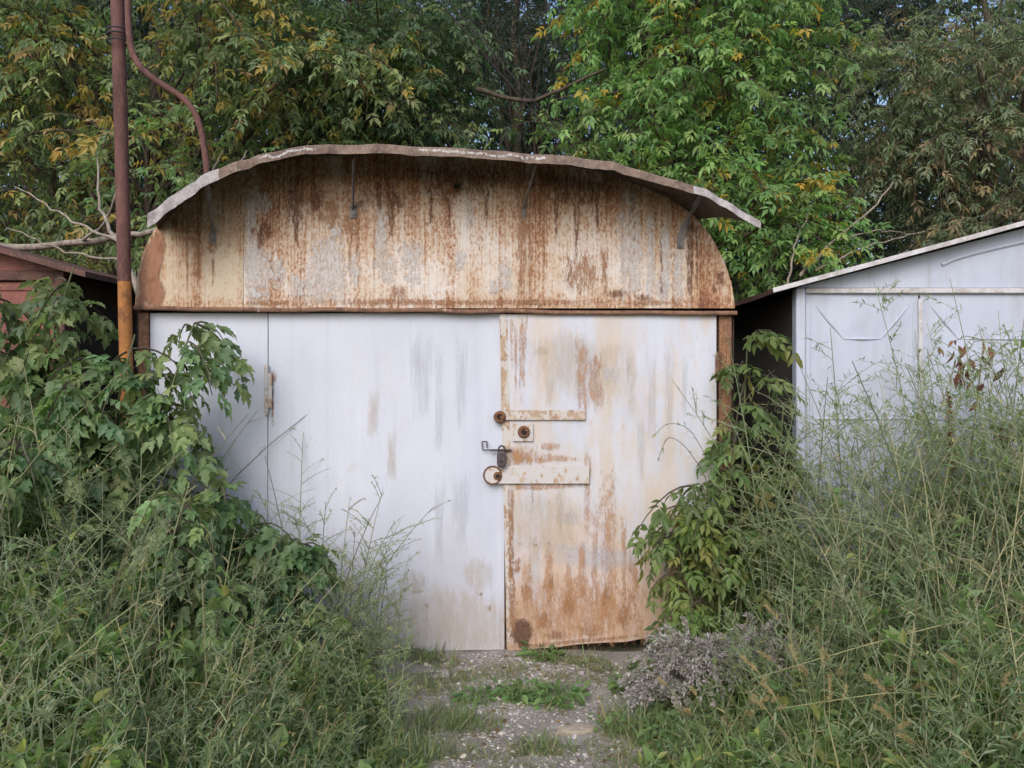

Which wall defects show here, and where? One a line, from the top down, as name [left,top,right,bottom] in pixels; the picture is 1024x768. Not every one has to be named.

corrosion [137,193,220,306]
corrosion [249,219,271,255]
corrosion [286,173,361,271]
corrosion [340,161,675,305]
corrosion [686,221,699,297]
corrosion [577,346,601,408]
corrosion [512,443,566,463]
corrosion [508,481,643,649]